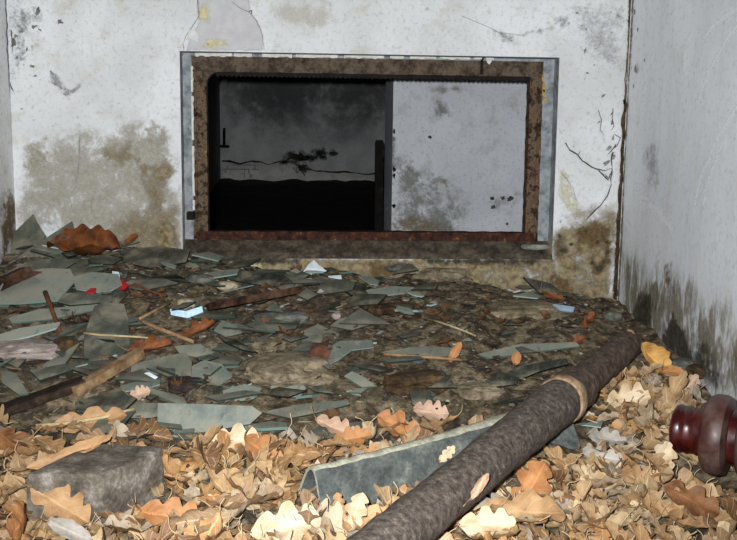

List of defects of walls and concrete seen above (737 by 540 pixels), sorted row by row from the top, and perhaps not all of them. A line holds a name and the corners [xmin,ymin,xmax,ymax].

peeling [187,0,494,65]
water stain [22,124,181,247]
rust [216,0,634,301]
crack [558,110,621,226]
water stain [622,261,737,393]